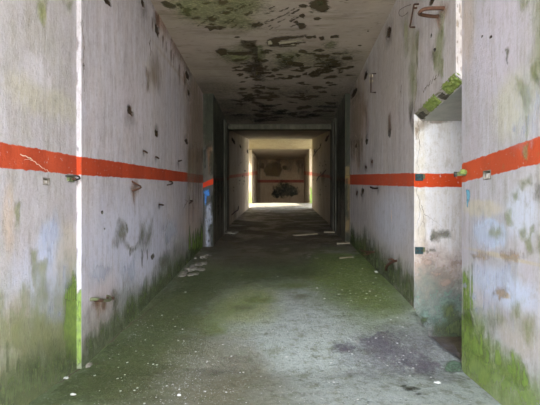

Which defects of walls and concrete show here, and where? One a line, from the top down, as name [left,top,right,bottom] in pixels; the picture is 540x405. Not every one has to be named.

corrosion [417,6,445,18]
water stain [65,274,77,300]
water stain [463,271,473,310]
water stain [462,320,529,389]